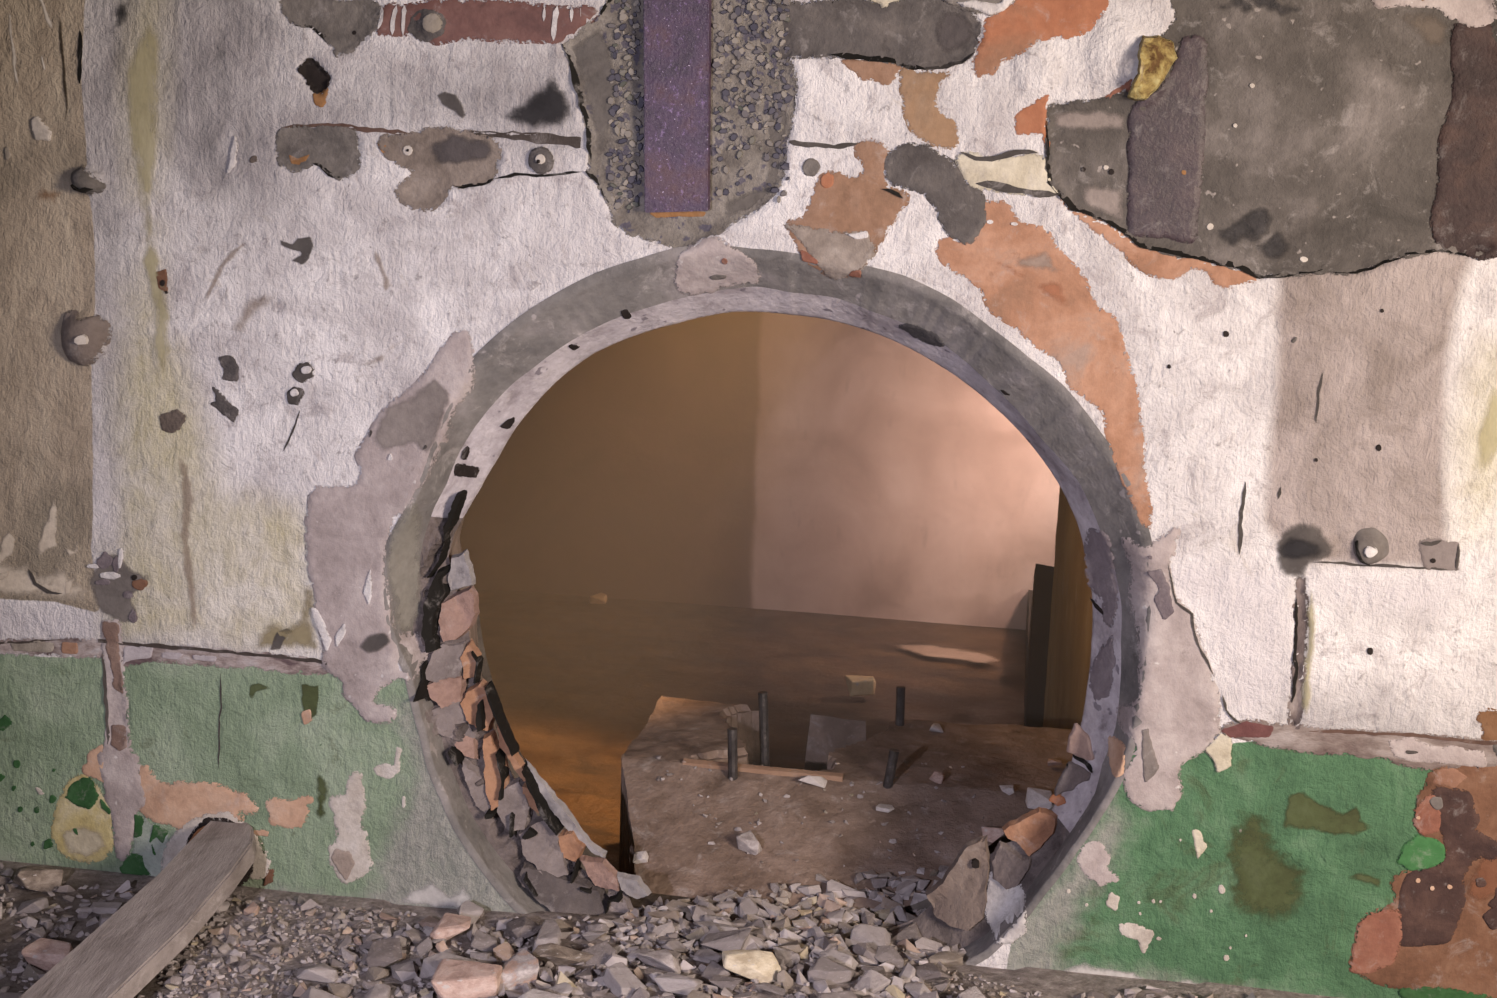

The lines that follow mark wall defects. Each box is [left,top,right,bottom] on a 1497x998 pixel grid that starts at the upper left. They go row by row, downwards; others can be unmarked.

spalling [562,0,1153,530]
peeling [1061,199,1257,289]
peeling [0,504,402,886]
flaking render [413,446,652,916]
spalling [1084,528,1119,701]
flaking render [925,723,1095,931]
peeling [1076,840,1162,953]
peeling [1396,834,1446,871]
peeling [1398,986,1492,998]